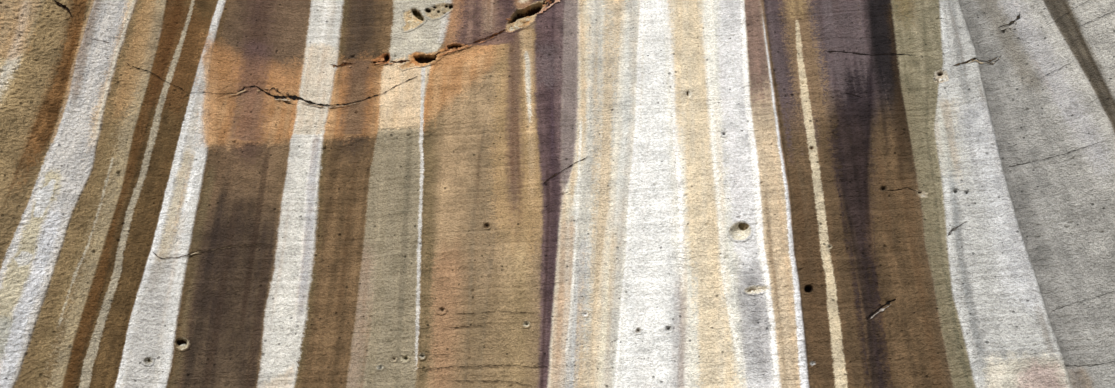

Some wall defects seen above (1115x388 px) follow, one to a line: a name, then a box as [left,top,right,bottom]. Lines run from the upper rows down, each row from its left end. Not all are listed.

water stain [0,0,538,388]
crack [92,0,560,108]
spalling [371,41,468,71]
spalling [401,1,455,33]
water stain [422,0,951,388]
water stain [921,0,1115,388]